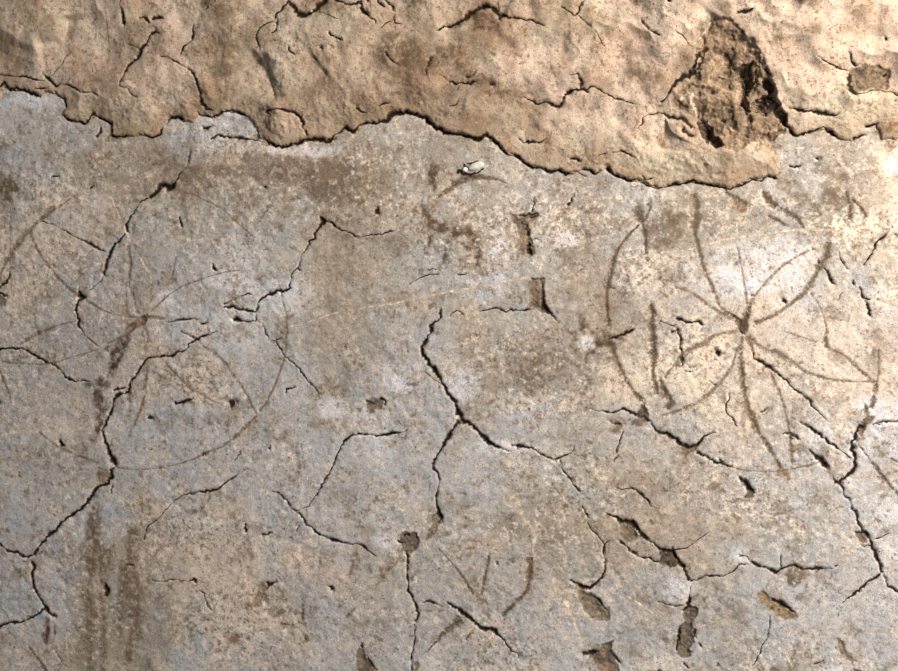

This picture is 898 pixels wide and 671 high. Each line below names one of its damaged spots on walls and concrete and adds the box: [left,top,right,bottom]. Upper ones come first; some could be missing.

crack [0,0,819,190]
spalling [661,19,787,151]
crack [786,107,876,140]
spalling [846,64,890,95]
spalling [512,199,538,258]
spalling [648,304,675,409]
crack [0,216,408,628]
crack [420,307,838,611]
crack [753,352,898,603]
crack [405,553,519,671]
spalling [570,580,610,621]
spalling [676,606,701,669]